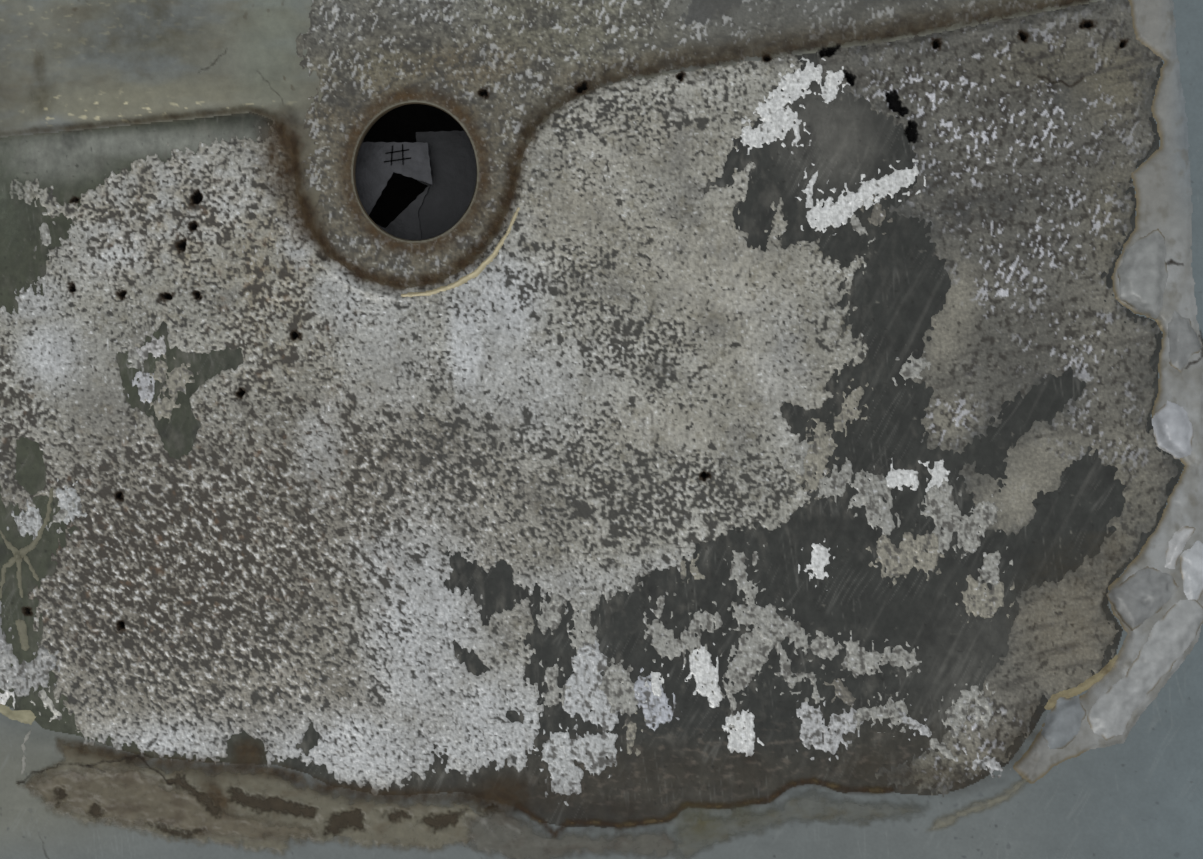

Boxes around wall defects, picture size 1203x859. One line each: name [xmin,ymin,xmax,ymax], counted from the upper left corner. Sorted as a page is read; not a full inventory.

peeling [732,57,850,155]
peeling [33,212,56,256]
peeling [797,159,926,243]
corrosion [0,54,868,796]
corrosion [295,0,1178,797]
peeling [892,351,931,388]
peeling [7,478,87,540]
peeling [783,378,1015,623]
peeling [0,601,67,723]
peeling [527,540,1011,806]
corrosion [517,778,849,837]